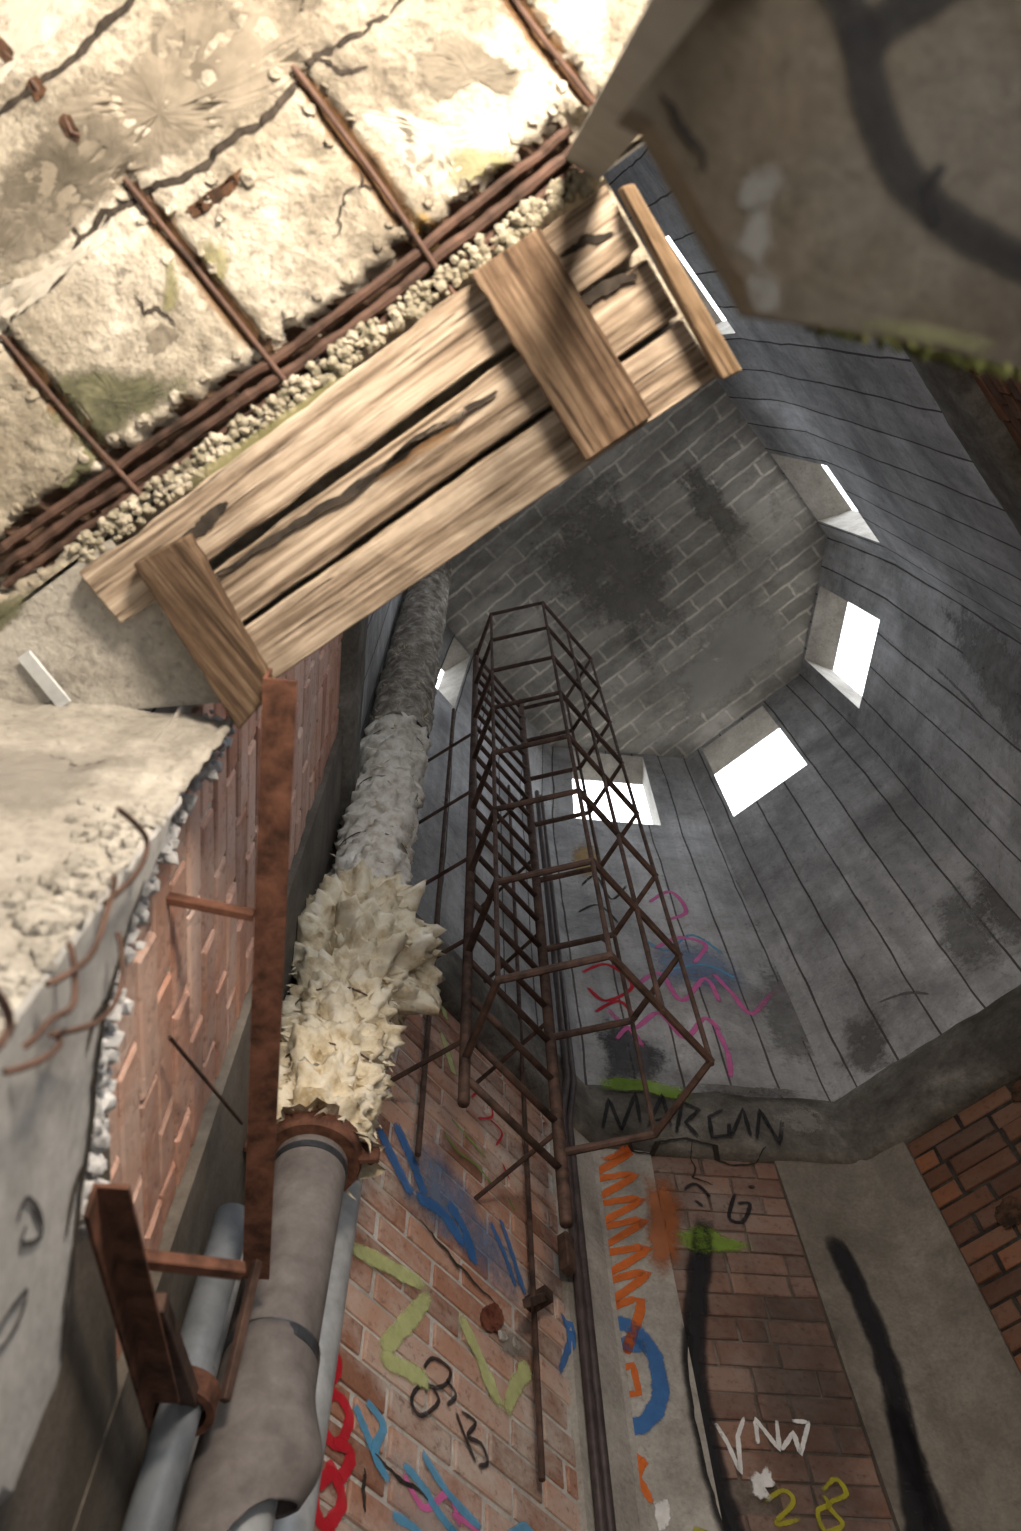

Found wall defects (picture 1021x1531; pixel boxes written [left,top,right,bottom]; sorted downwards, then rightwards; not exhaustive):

water stain [0,117,153,250]
crack [0,0,403,339]
spalling [0,0,604,589]
water stain [417,32,525,98]
water stain [544,483,781,719]
spalling [0,710,235,1238]